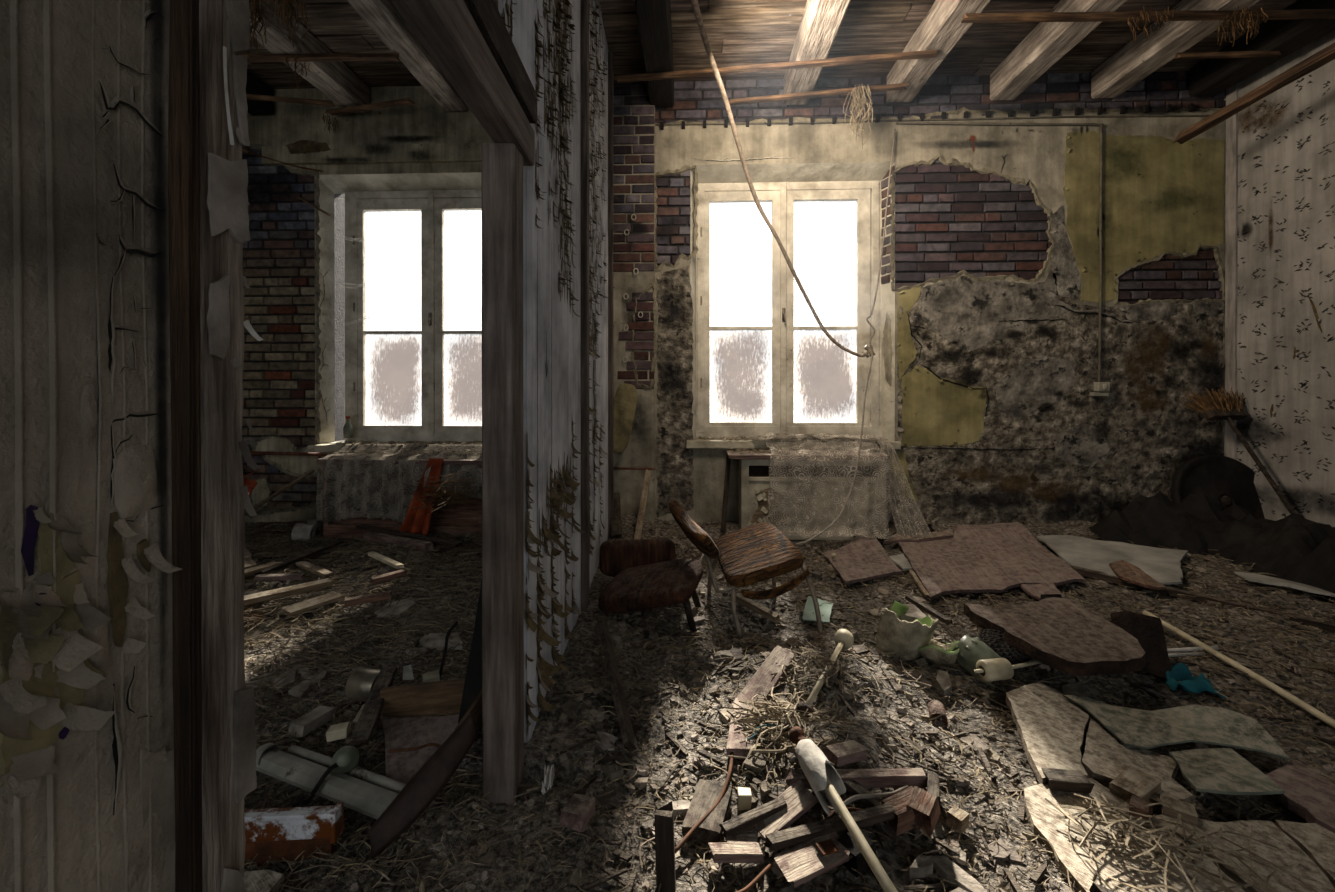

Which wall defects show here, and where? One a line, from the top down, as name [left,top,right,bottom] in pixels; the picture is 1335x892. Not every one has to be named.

crack [99,0,165,136]
crack [96,163,166,522]
flaking render [207,0,331,519]
flaking render [590,11,1226,527]
peeling [0,627,116,731]
peeling [30,582,89,607]
peeling [113,518,182,620]
peeling [525,407,605,721]